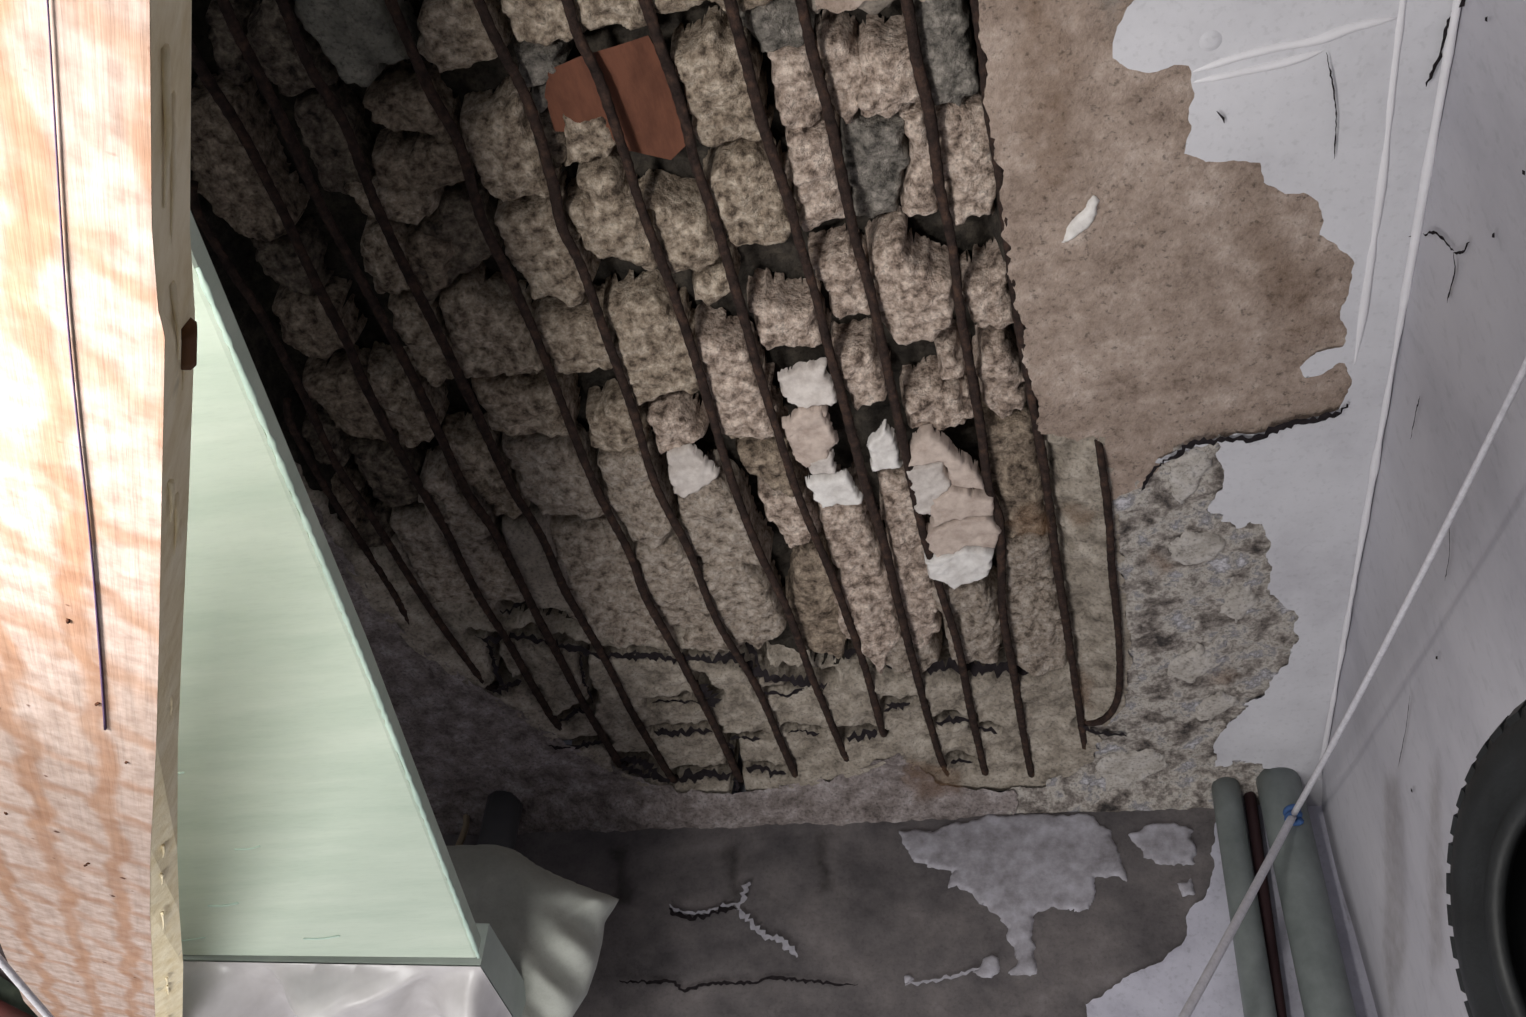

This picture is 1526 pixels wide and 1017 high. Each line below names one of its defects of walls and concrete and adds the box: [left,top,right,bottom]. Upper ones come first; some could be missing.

spalling [190,0,1354,836]
crack [1141,403,1348,490]
water stain [442,834,479,846]
crack [619,882,858,993]
water stain [514,807,1216,1017]